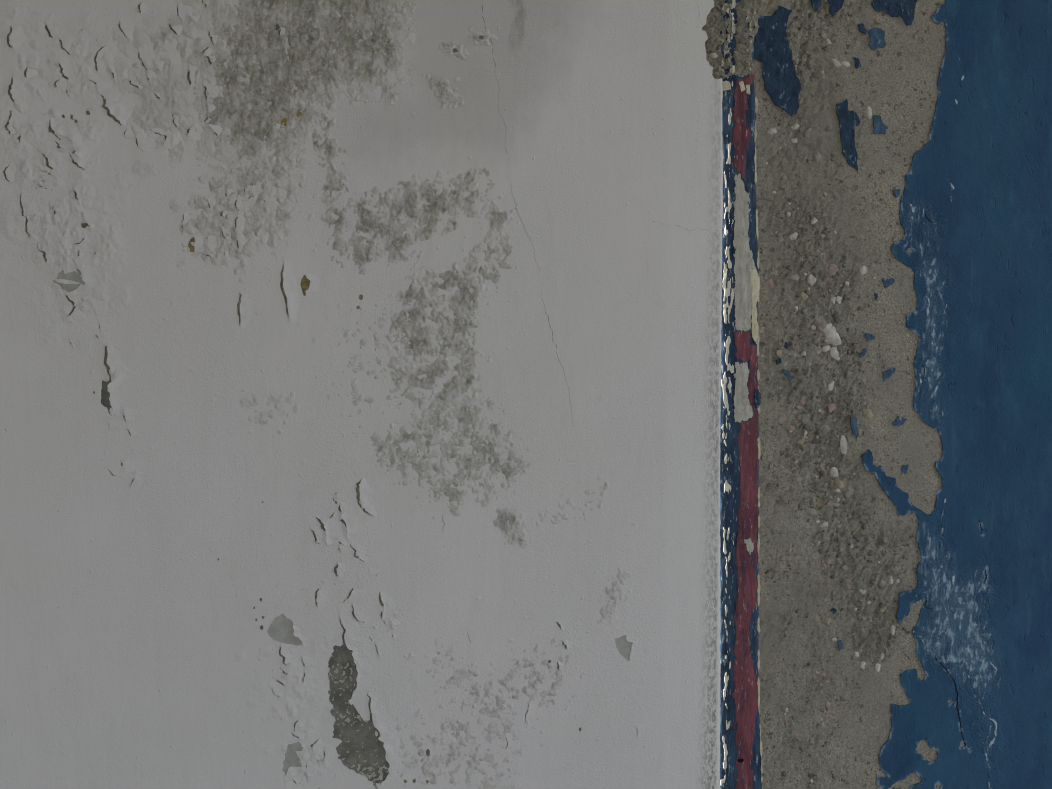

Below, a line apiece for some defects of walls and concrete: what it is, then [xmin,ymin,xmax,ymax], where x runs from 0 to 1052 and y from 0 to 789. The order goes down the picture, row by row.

spalling [105,0,430,259]
peeling [38,246,99,292]
peeling [101,339,130,417]
peeling [702,0,946,789]
peeling [311,477,374,579]
peeling [267,613,307,664]
peeling [328,609,404,789]
crack [923,569,987,757]
peeling [280,741,306,782]